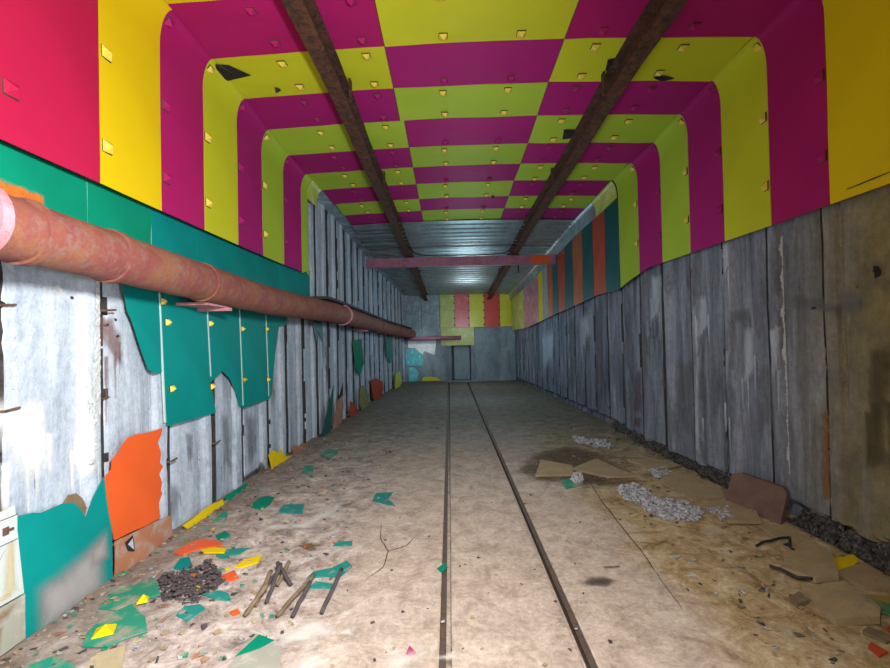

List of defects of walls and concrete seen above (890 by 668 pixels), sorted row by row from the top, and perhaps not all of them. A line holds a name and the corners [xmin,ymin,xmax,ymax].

rust [100,320,121,397]
damp [865,351,890,464]
peeling [43,538,106,626]